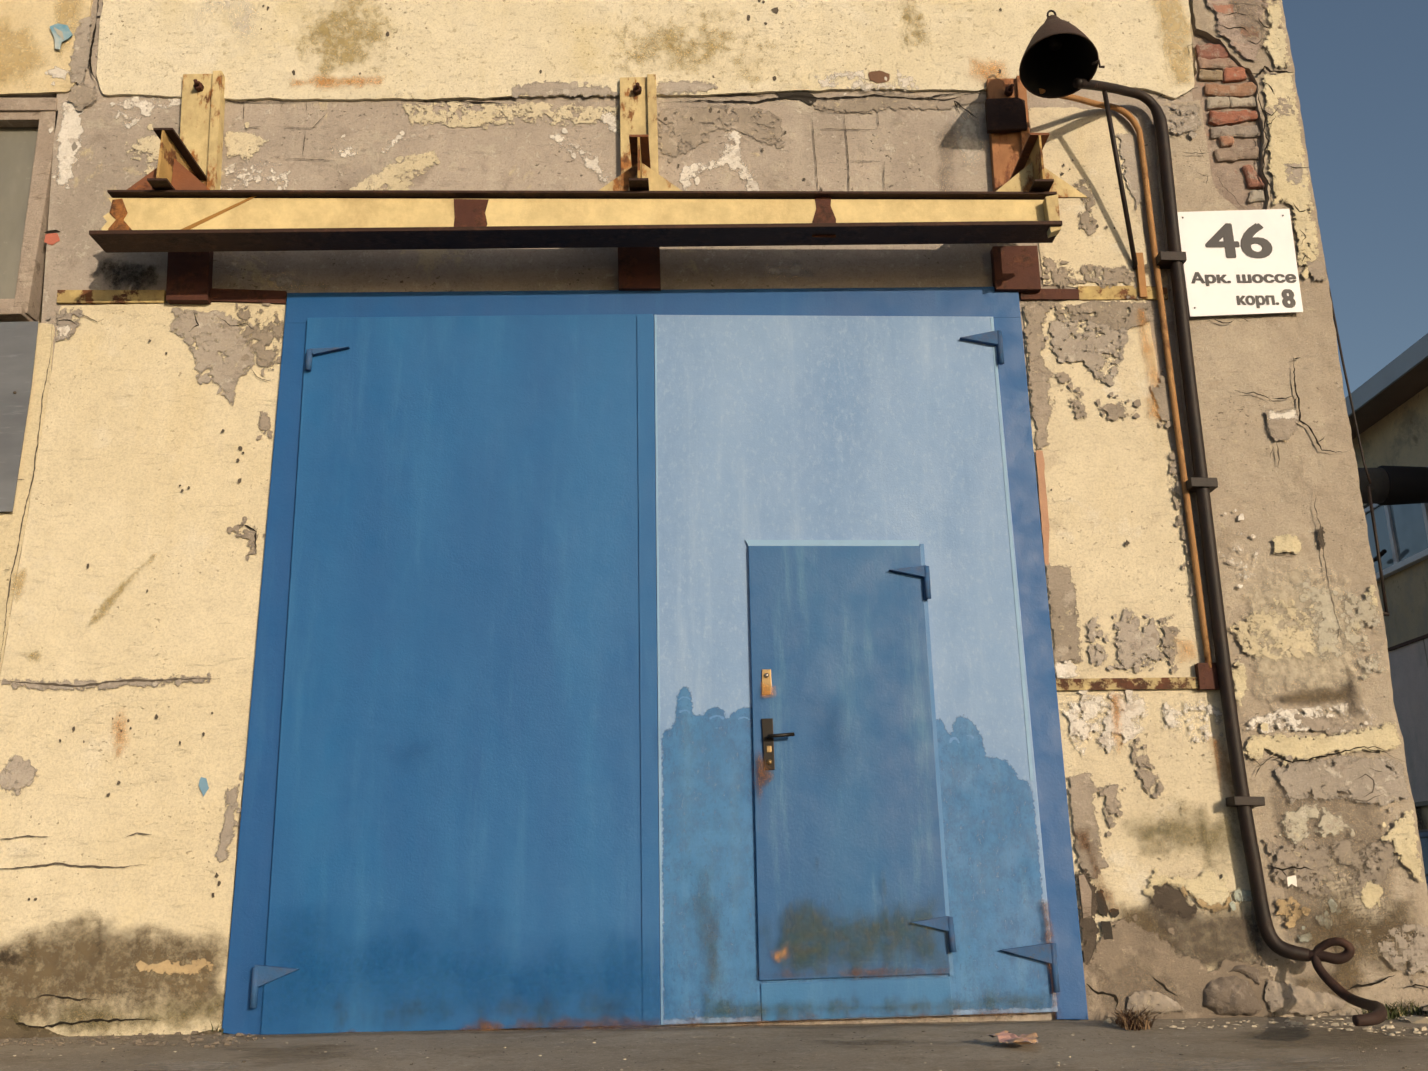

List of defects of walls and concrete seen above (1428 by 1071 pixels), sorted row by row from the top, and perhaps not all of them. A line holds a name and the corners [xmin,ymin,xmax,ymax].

peeling [349,70,620,190]
spalling [1161,0,1328,288]
crack [0,315,208,687]
peeling [170,303,284,406]
peeling [1023,256,1198,674]
crack [1242,357,1346,465]
crack [1278,486,1341,638]
peeling [1230,598,1320,706]
crack [0,832,150,869]
spalling [1067,719,1276,1021]
peeling [1243,707,1424,930]
damp [0,919,220,1022]